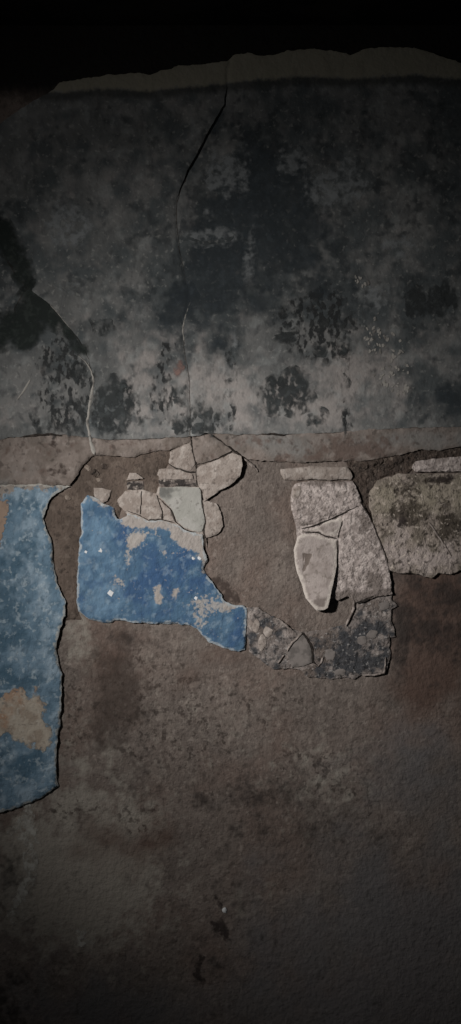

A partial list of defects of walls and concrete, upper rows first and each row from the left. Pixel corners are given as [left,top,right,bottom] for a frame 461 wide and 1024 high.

damp [0,218,236,446]
crack [128,87,241,546]
mould [260,290,355,426]
flaking render [0,446,461,850]